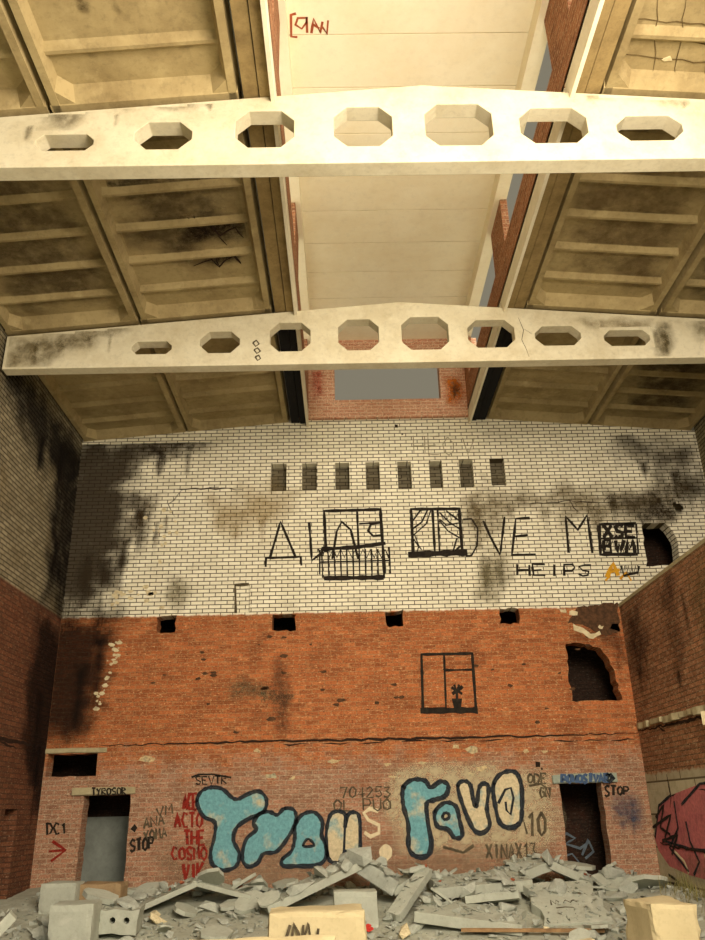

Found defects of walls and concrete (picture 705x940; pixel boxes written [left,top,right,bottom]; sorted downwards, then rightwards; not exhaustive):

crack [627,0,705,69]
water stain [467,495,525,528]
water stain [557,437,705,525]
water stain [25,443,185,811]
spalling [559,602,621,650]